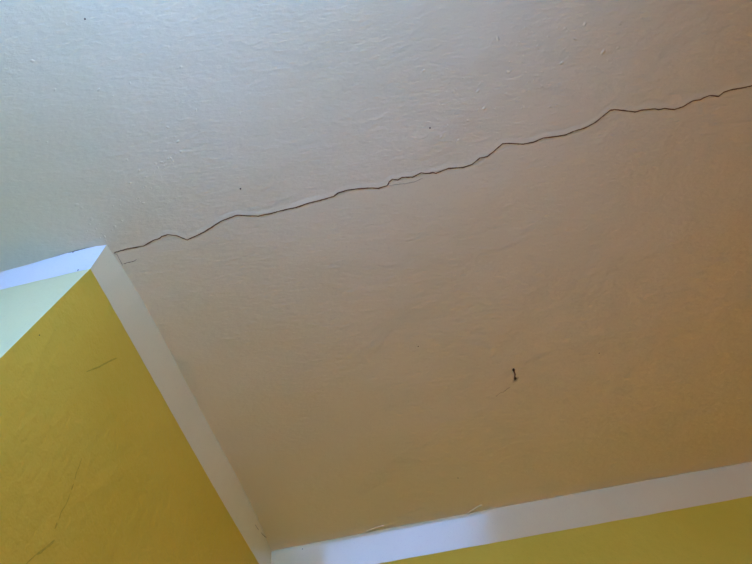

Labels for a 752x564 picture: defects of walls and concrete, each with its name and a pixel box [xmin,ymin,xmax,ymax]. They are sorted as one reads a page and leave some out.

crack [113,81,752,264]